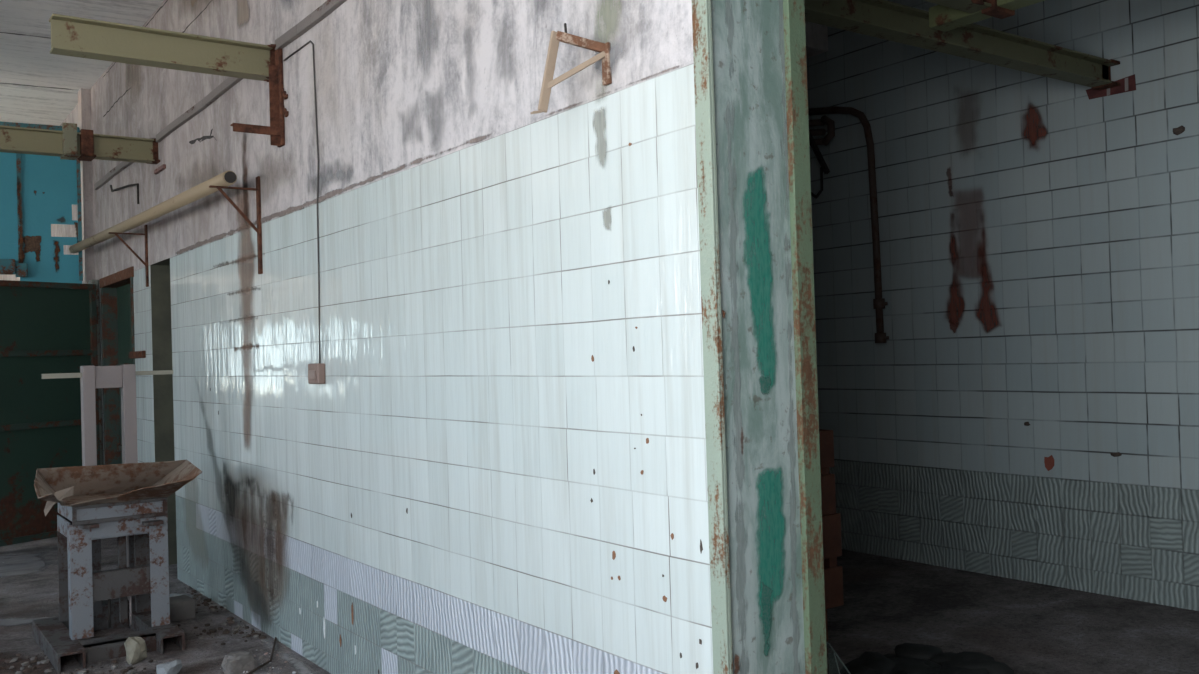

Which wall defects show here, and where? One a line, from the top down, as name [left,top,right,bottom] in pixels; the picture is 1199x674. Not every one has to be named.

water stain [237,0,249,28]
water stain [421,0,438,65]
water stain [595,0,622,71]
water stain [593,109,605,165]
rust [1023,104,1047,148]
water stain [312,167,351,193]
rust [17,177,60,271]
rust [947,228,999,333]
peeling [725,105,800,674]